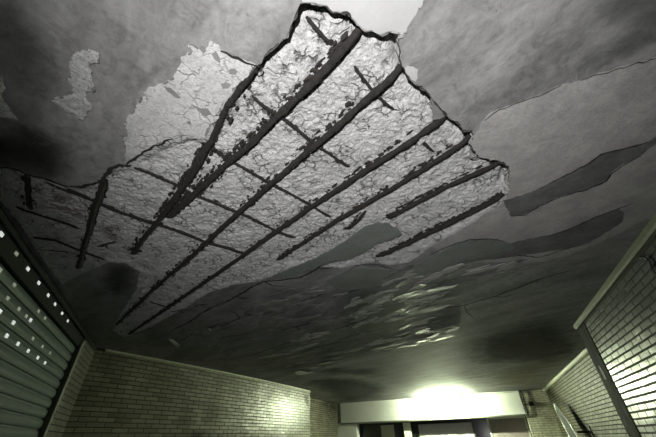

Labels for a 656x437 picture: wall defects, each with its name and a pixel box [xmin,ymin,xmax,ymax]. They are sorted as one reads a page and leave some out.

crack [171,259,340,341]
spalling [0,0,656,337]